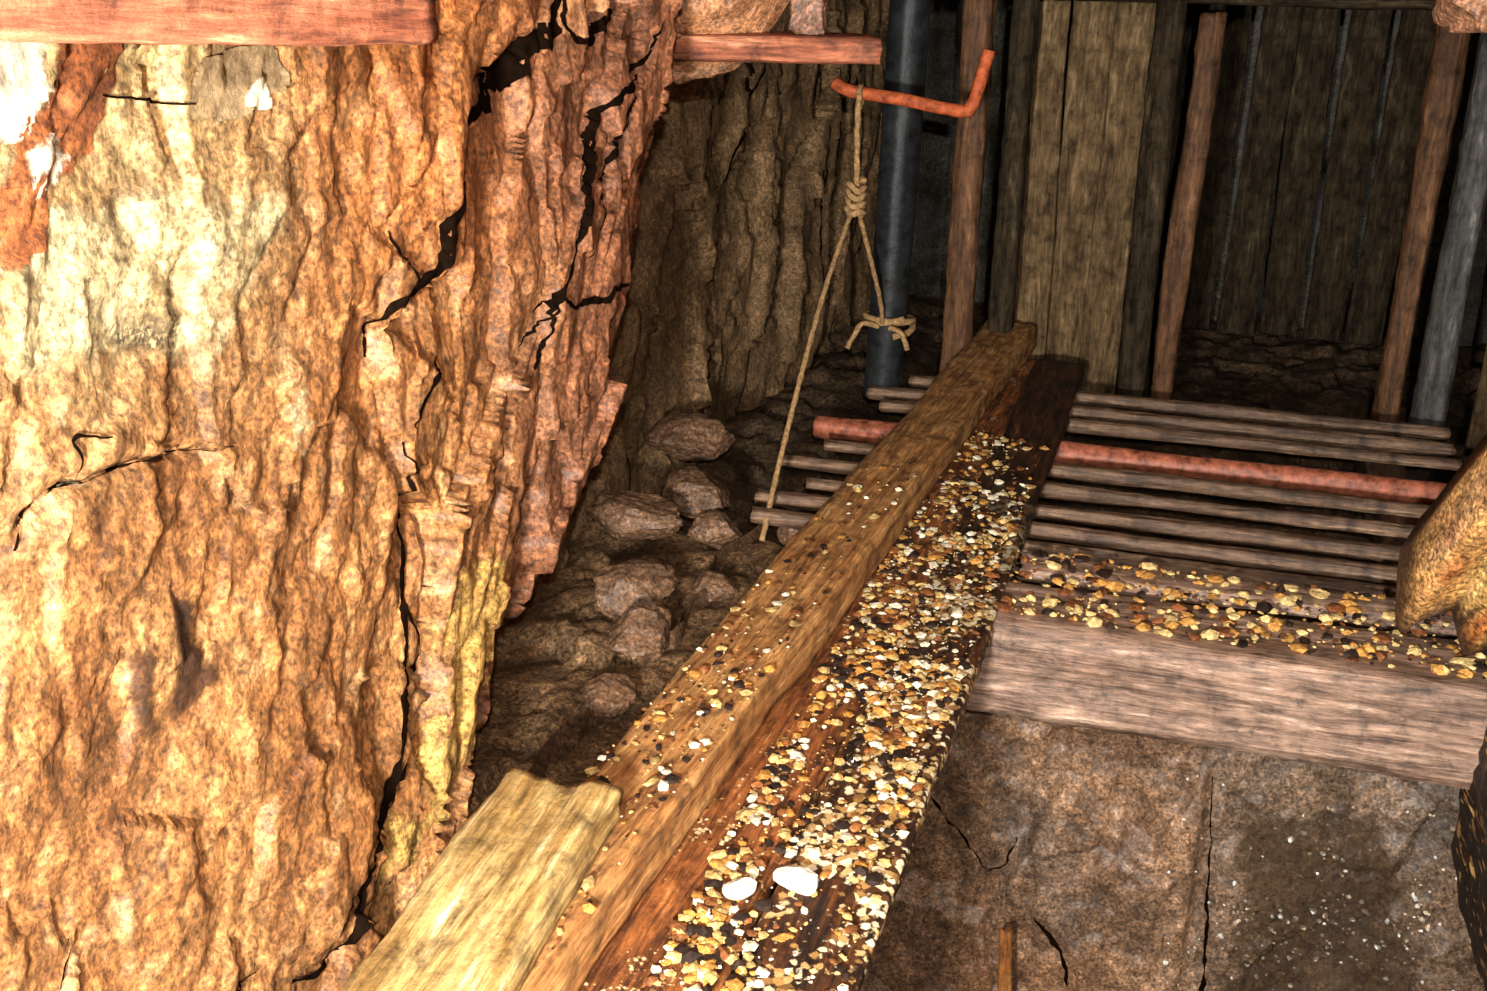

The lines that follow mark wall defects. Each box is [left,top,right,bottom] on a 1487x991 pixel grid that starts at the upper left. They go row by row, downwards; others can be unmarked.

crack [468,0,613,128]
crack [362,181,466,357]
crack [519,23,663,370]
crack [13,433,234,551]
crack [291,356,442,984]